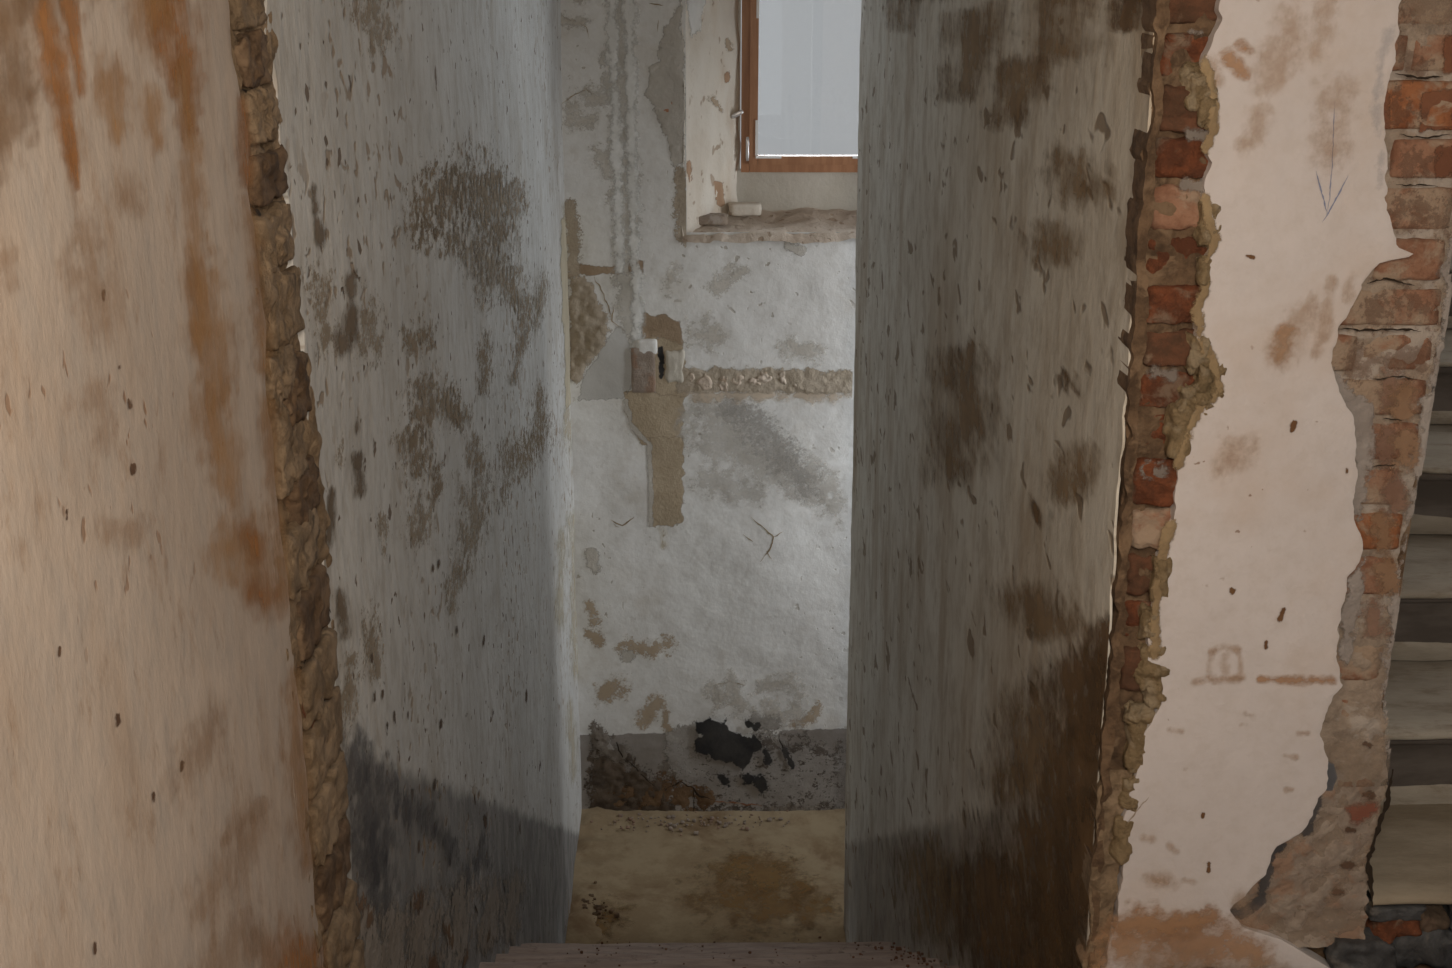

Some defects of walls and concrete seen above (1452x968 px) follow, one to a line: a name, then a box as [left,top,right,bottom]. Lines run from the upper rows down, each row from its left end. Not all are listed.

corrosion [37,0,123,187]
spalling [228,0,366,968]
peeling [390,132,555,634]
peeling [562,49,621,203]
spalling [564,199,644,384]
peeling [644,0,706,247]
peeling [713,181,725,207]
spalling [623,262,853,528]
spalling [1076,0,1227,968]
flaking render [1230,0,1452,948]
damp [695,717,795,796]